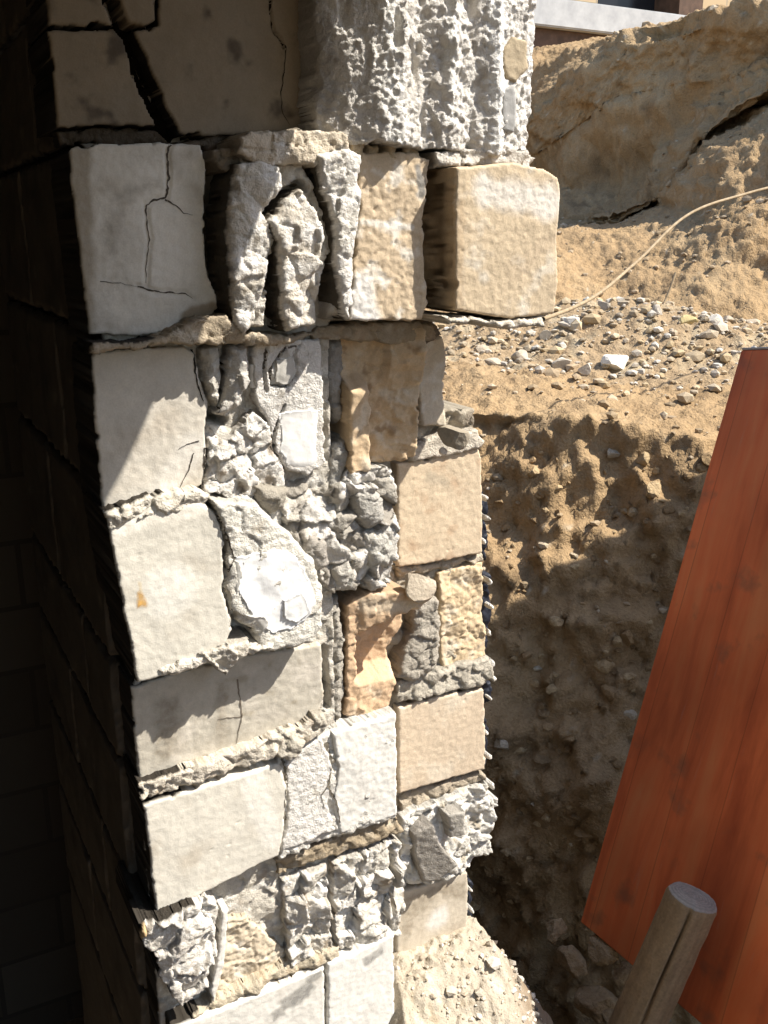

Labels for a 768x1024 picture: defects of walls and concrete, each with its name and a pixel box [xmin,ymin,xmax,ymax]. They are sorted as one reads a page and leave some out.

crack [83,0,193,299]
crack [269,1,289,123]
spalling [196,0,537,634]
crack [218,679,242,740]